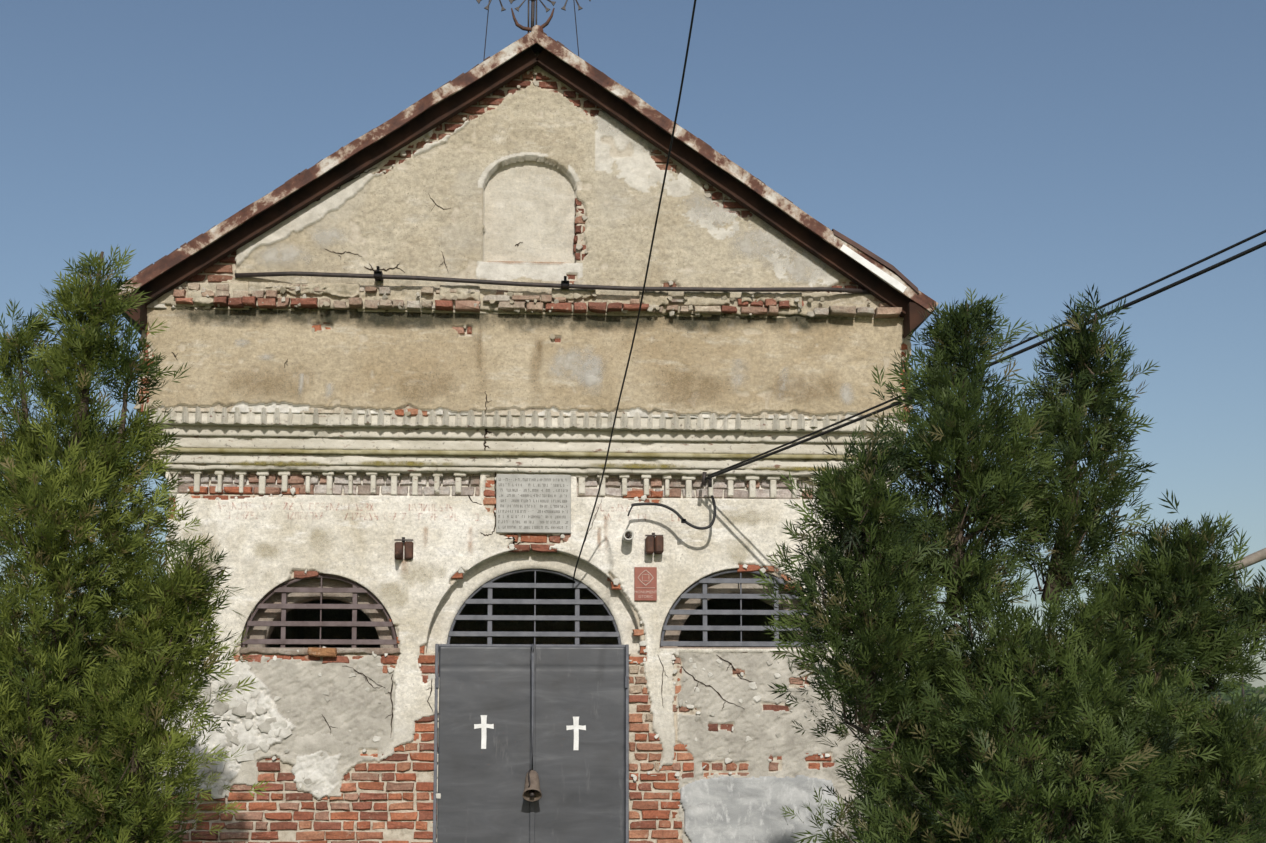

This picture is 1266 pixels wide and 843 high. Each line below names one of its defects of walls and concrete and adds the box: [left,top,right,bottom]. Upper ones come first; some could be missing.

spalling [377,68,604,174]
spalling [573,198,588,261]
spalling [898,338,913,421]
spalling [187,486,300,500]
spalling [483,477,496,513]
spalling [623,490,663,503]
spalling [607,577,622,590]
spalling [158,618,441,843]
spalling [629,621,825,843]
spalling [805,753,835,770]